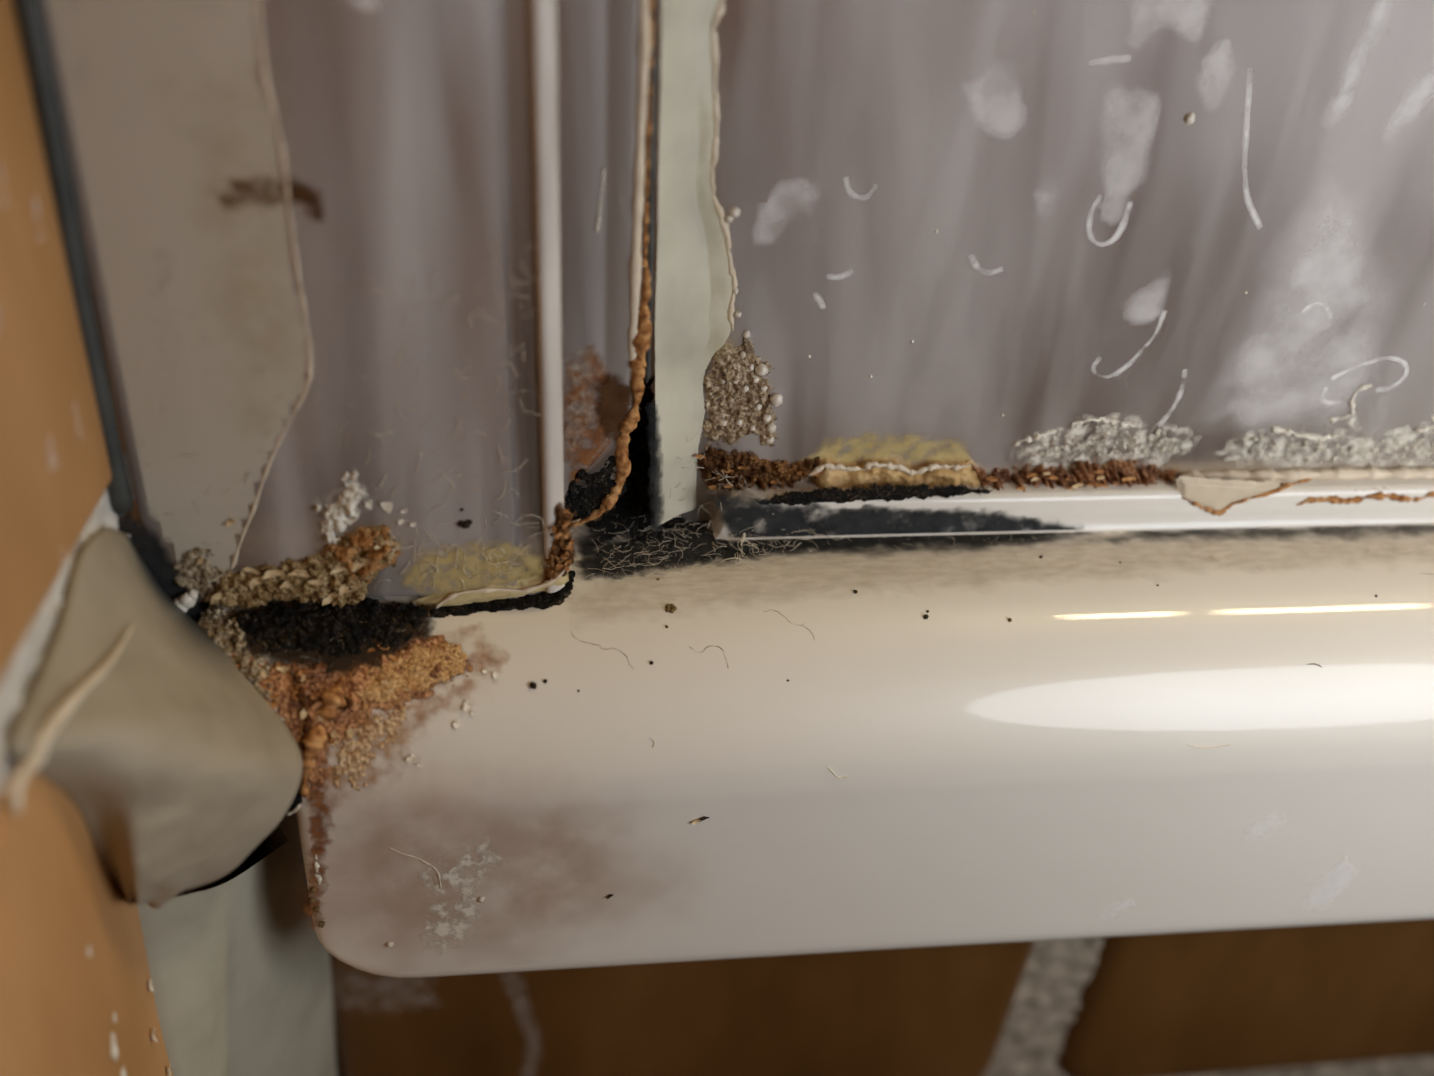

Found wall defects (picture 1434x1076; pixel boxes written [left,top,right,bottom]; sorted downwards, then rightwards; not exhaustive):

rust [541,0,659,583]
leakage [229,377,1088,658]
rust [695,435,1181,492]
leakage [1111,524,1434,542]
rust [197,524,495,929]